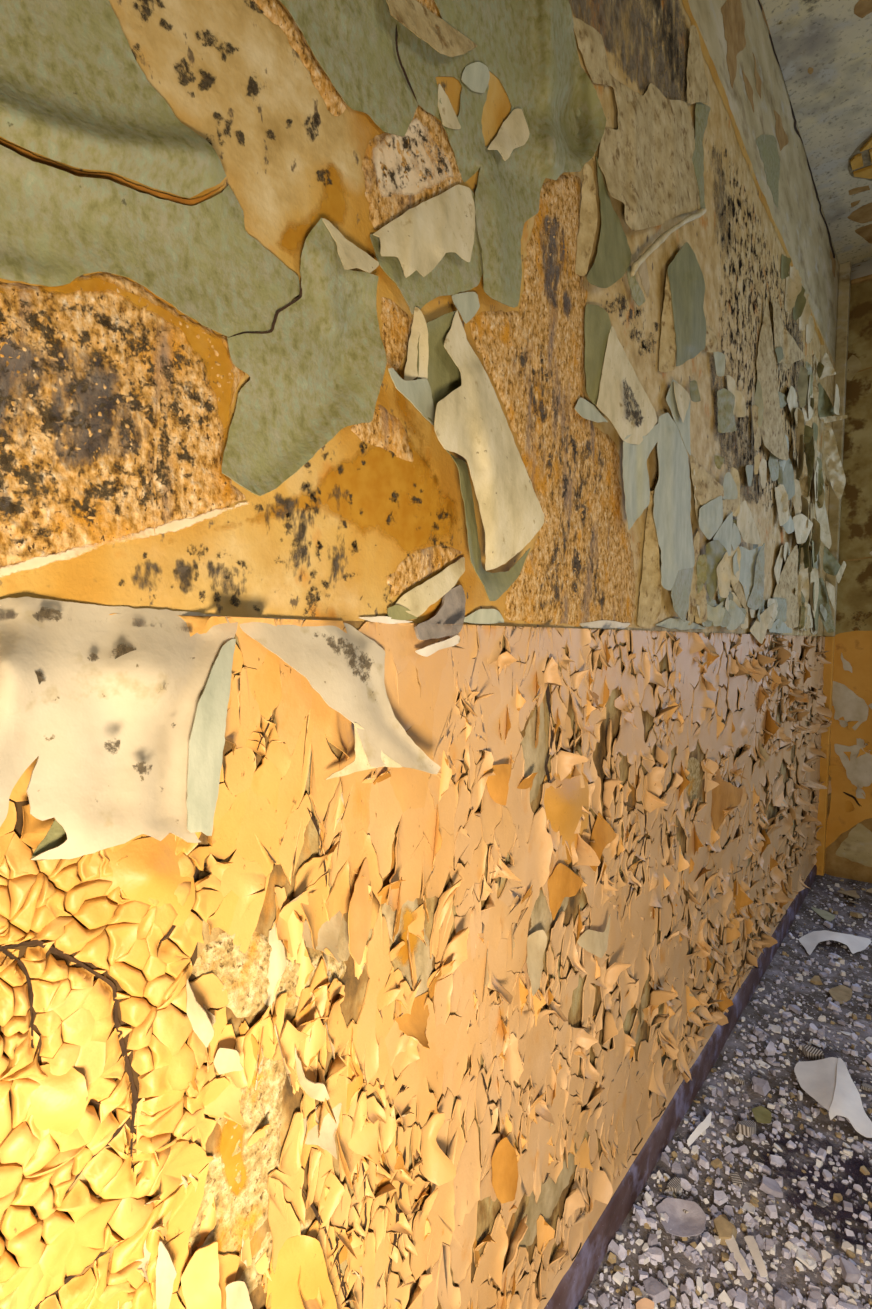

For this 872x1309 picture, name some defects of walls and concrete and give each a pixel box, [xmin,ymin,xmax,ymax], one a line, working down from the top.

leakage [0,277,234,547]
peeling [0,0,711,601]
leakage [543,216,571,316]
leakage [568,0,825,517]
peeling [721,0,762,112]
peeling [756,110,789,208]
peeling [470,174,872,1179]
crack [194,844,224,884]
peeling [0,557,631,1309]
crack [0,940,138,1188]
crack [40,1245,113,1302]